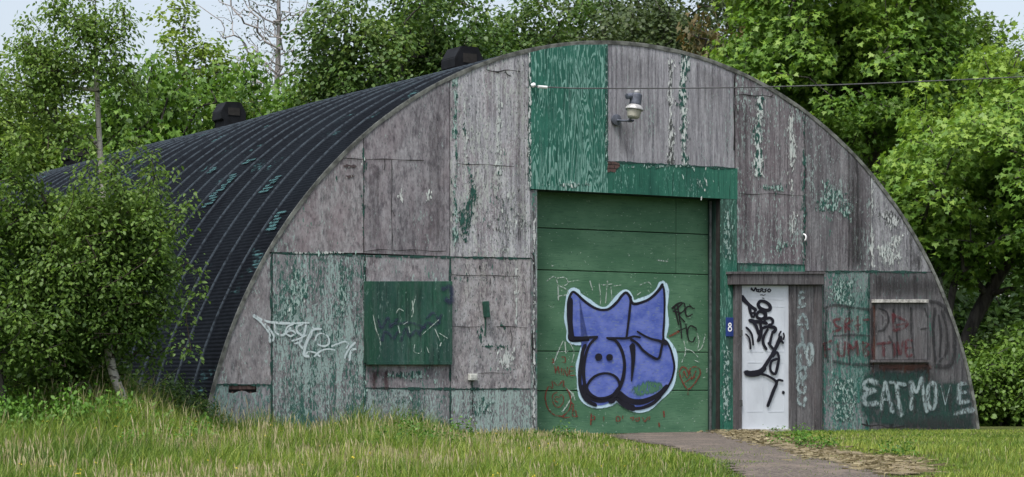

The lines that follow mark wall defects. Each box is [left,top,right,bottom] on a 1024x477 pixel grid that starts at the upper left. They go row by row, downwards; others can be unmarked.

peeling [284,250,367,325]
peeling [451,53,589,430]
peeling [604,47,714,200]
peeling [752,94,857,266]
peeling [824,278,862,306]
peeling [823,371,861,422]